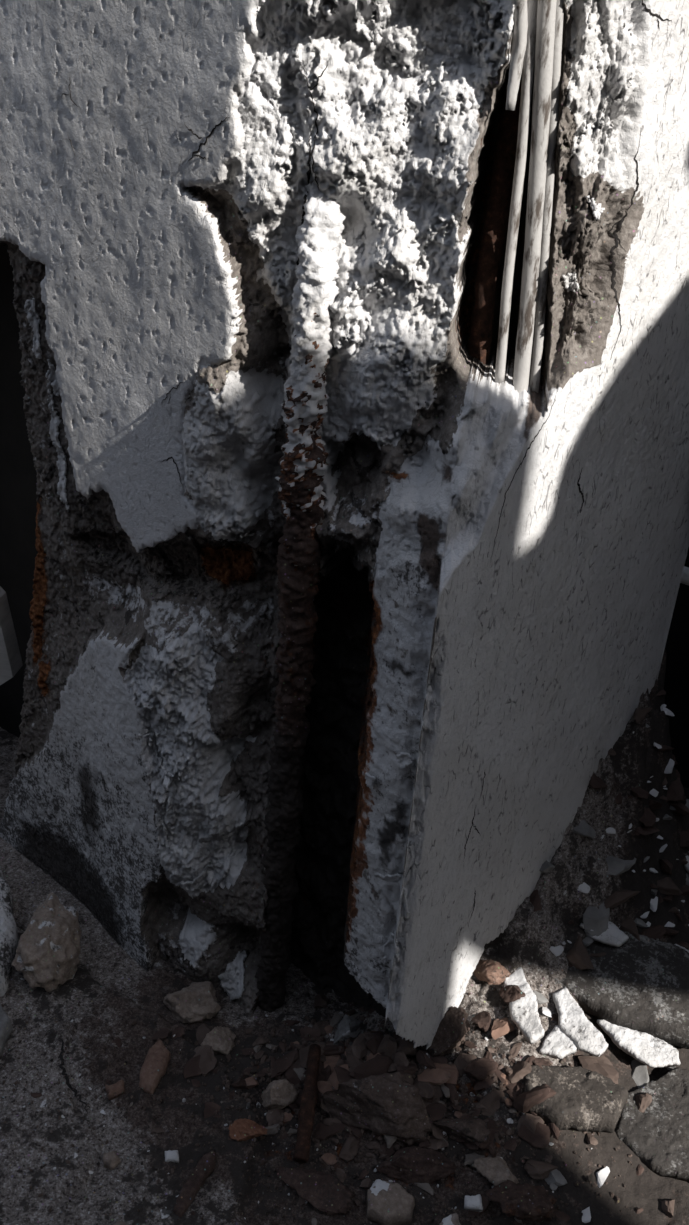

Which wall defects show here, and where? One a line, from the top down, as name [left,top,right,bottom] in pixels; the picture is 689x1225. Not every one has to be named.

crack [184,114,232,161]
spalling [531,0,653,406]
corrosion [29,501,51,697]
spalling [0,0,535,1049]
flaking render [584,921,629,947]